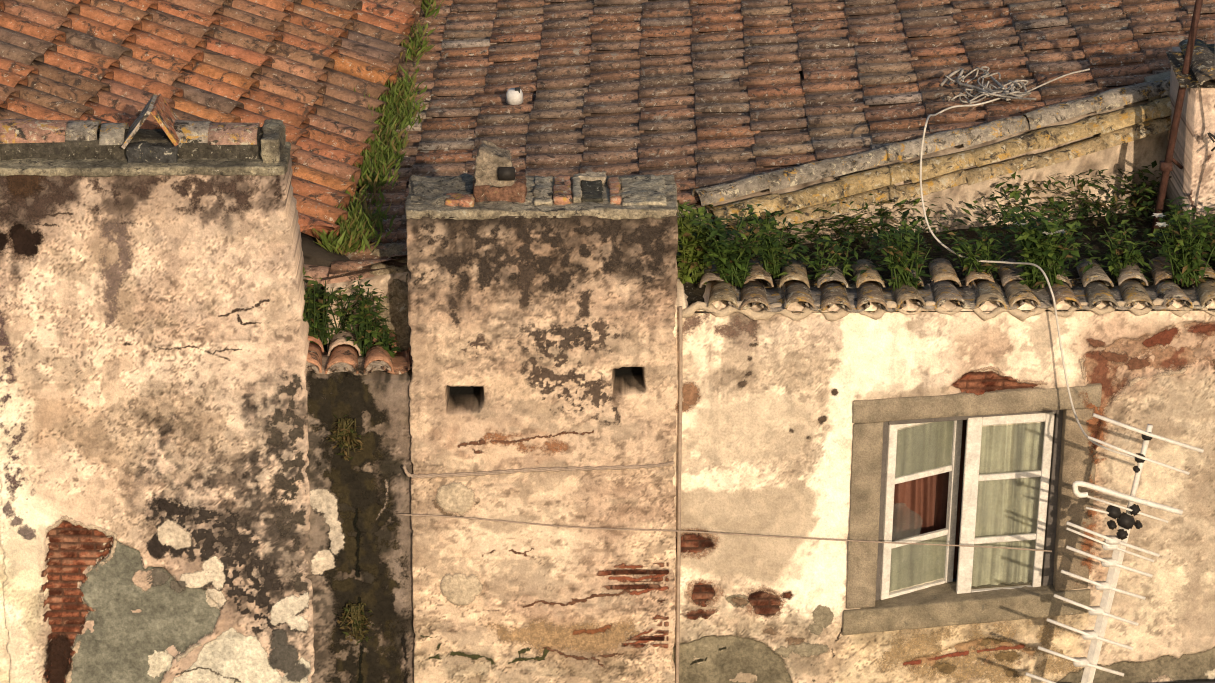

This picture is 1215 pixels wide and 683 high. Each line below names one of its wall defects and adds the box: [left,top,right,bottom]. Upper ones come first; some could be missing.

damp [0,175,258,327]
damp [0,286,16,407]
crack [124,299,269,361]
damp [518,318,623,426]
flaking render [951,366,1047,396]
damp [0,422,36,540]
damp [145,365,411,683]
peeling [309,489,345,576]
crack [458,430,594,454]
flaking render [18,515,227,683]
flaking render [597,528,834,683]
flaking render [1058,647,1215,683]